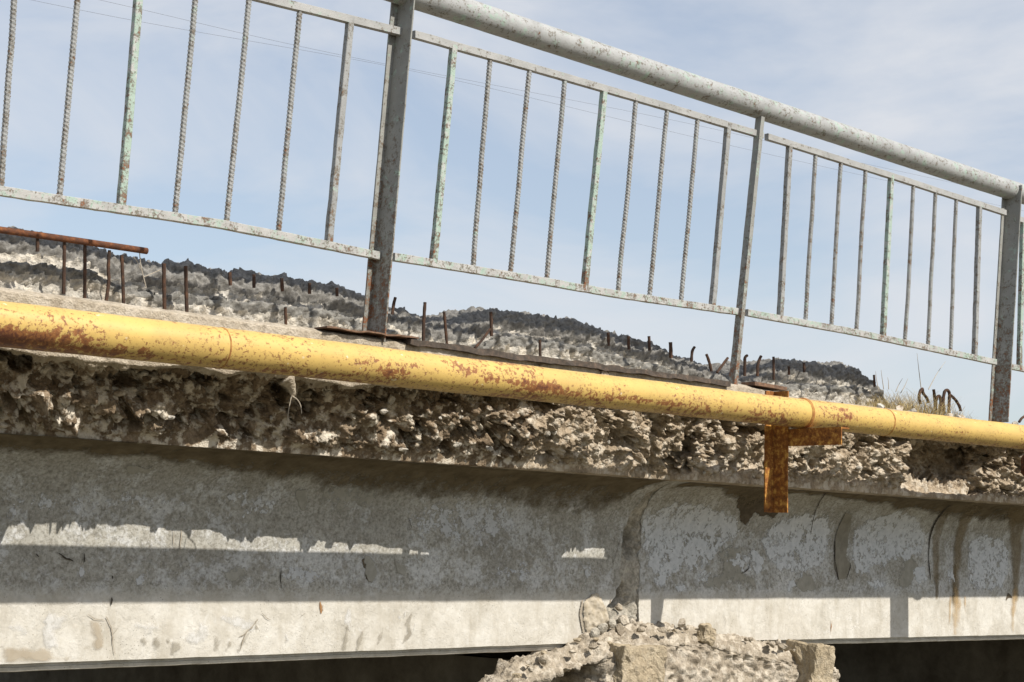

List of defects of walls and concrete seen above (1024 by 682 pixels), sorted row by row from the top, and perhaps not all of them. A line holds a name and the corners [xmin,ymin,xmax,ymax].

spalling [474,312,493,349]
spalling [908,387,962,413]
spalling [0,346,928,592]
spalling [788,432,1024,506]
crack [928,505,950,580]
spalling [580,593,610,633]